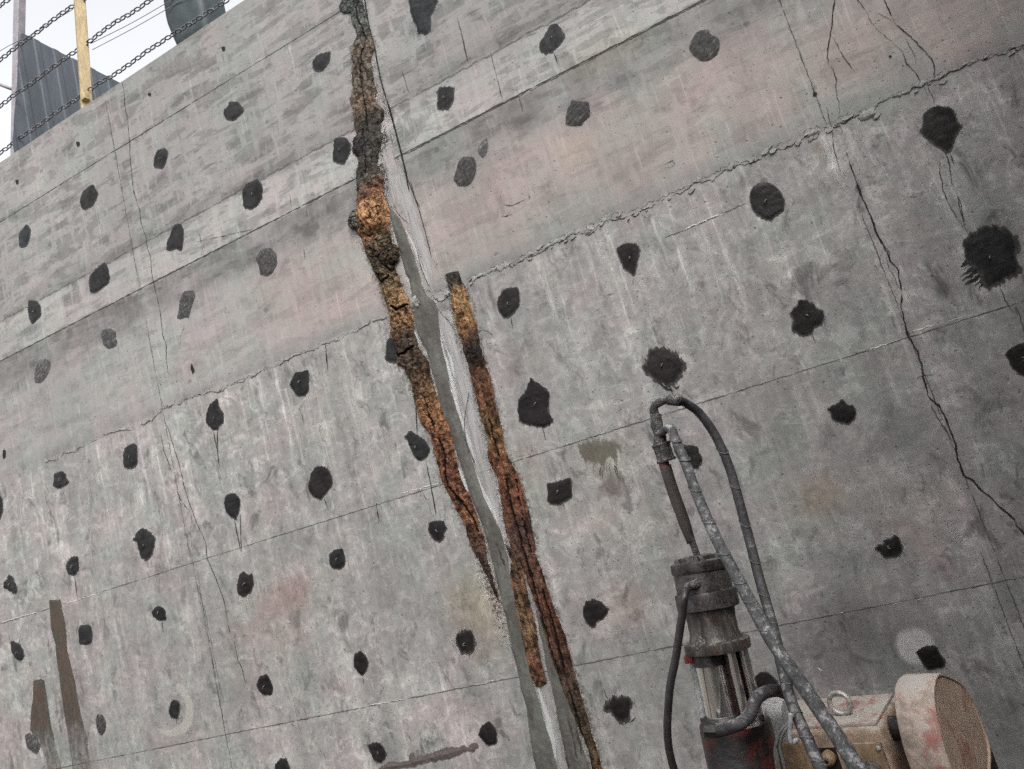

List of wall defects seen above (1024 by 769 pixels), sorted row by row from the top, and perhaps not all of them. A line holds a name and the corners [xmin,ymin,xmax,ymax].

crack [160,420,245,680]
corrosion [339,0,499,602]
corrosion [445,271,602,769]
crack [826,0,1024,535]